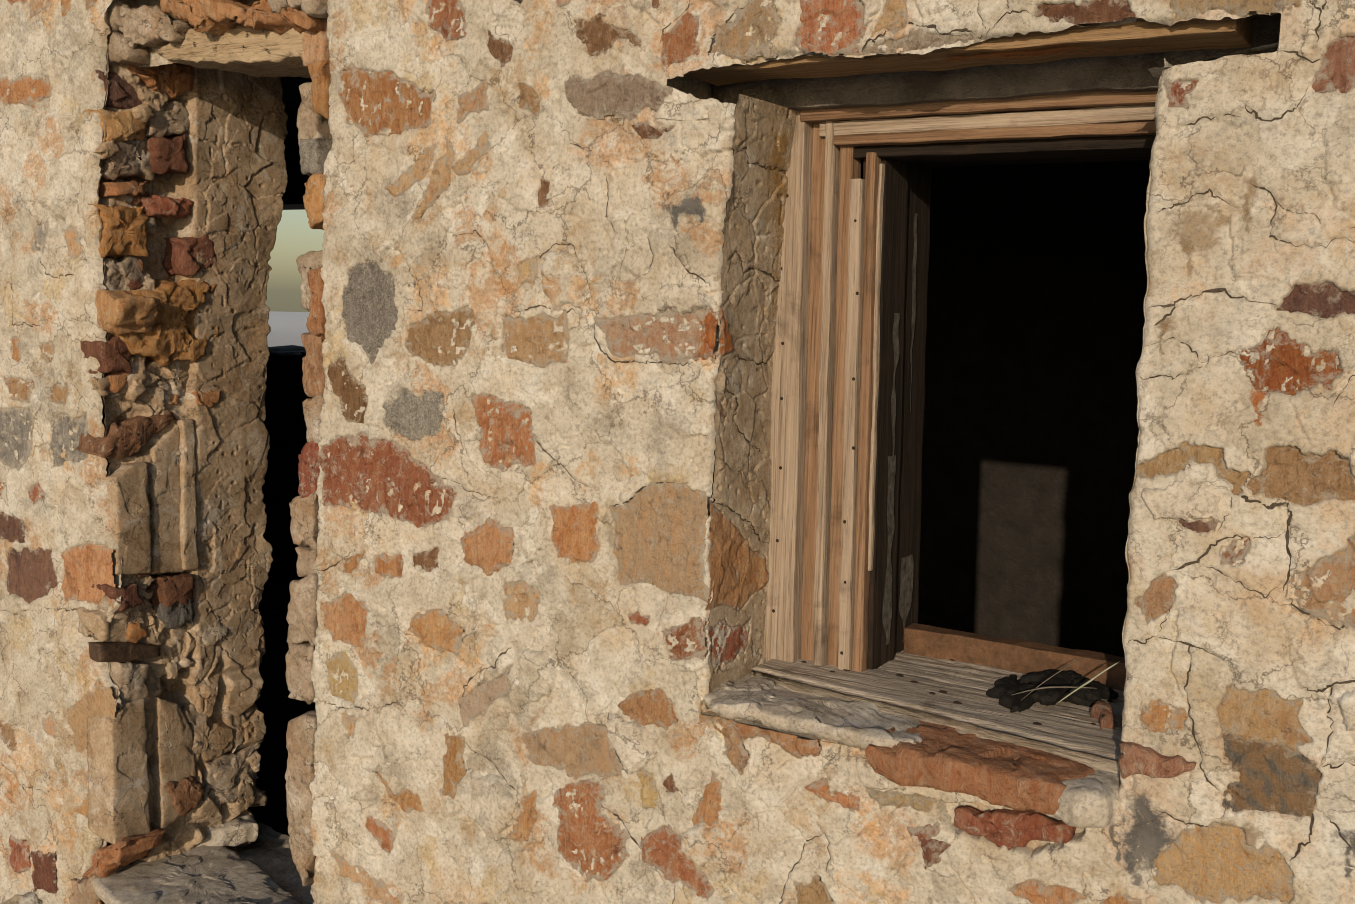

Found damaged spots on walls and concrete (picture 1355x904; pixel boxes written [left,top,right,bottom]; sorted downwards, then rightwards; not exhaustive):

crack [1183,1,1327,126]
crack [570,143,614,230]
crack [1159,185,1355,248]
crack [514,243,693,366]
crack [636,237,710,286]
crack [730,250,780,282]
crack [1139,288,1277,380]
crack [1173,494,1345,630]
crack [1126,609,1236,827]
crack [1305,680,1355,769]
crack [779,833,831,904]
crack [1290,810,1351,861]